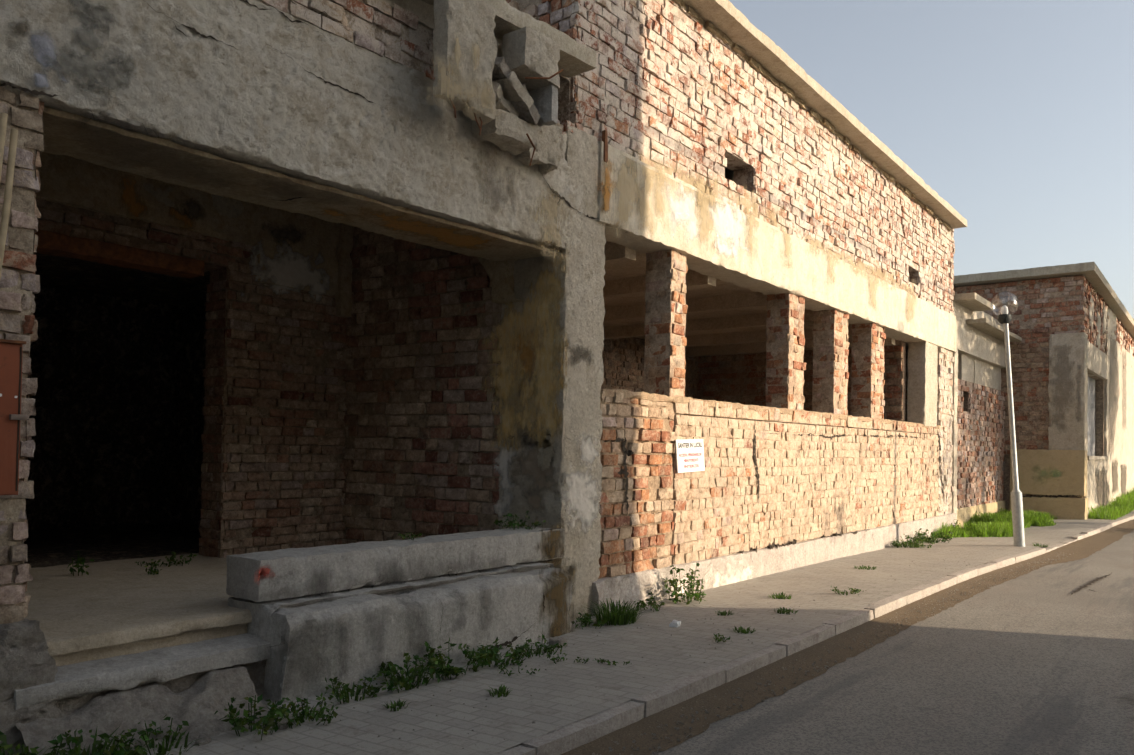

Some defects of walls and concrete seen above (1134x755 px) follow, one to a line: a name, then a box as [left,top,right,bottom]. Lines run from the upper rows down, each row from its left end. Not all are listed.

crack [143,0,238,50]
crack [241,0,355,34]
crack [267,44,392,108]
spalling [492,57,563,166]
crack [603,429,634,516]